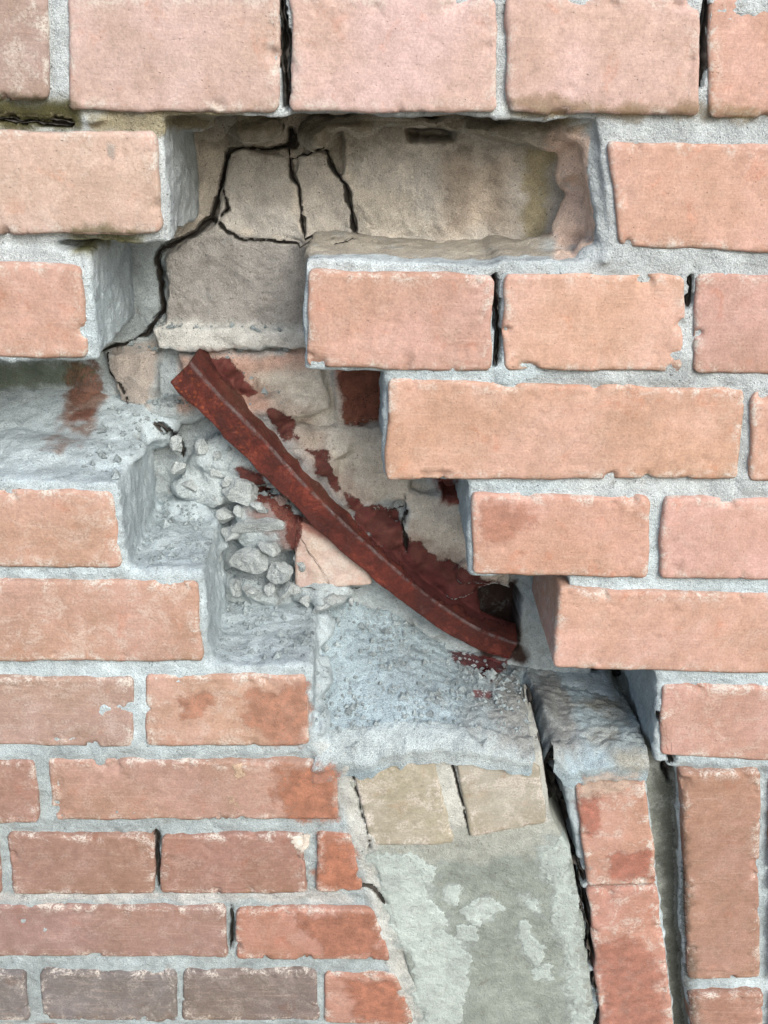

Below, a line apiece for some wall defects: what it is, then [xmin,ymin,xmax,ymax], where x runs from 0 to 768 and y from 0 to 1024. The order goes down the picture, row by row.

crack [699,0,707,87]
crack [102,0,358,405]
crack [492,274,500,365]
rust [211,357,257,397]
spalling [337,370,380,427]
rust [235,466,302,550]
spalling [295,517,372,587]
rust [267,408,510,627]
spalling [179,693,213,720]
spalling [241,682,312,746]
crack [153,829,161,886]
crack [526,684,599,1024]